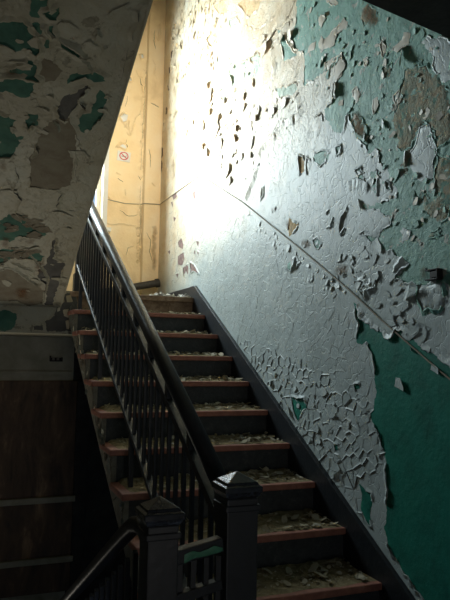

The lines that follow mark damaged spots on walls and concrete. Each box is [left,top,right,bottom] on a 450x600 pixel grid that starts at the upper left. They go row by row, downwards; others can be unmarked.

peeling [0,0,112,192]
crack [115,0,159,149]
peeling [0,214,92,396]
crack [167,184,385,524]
peeling [161,0,450,600]